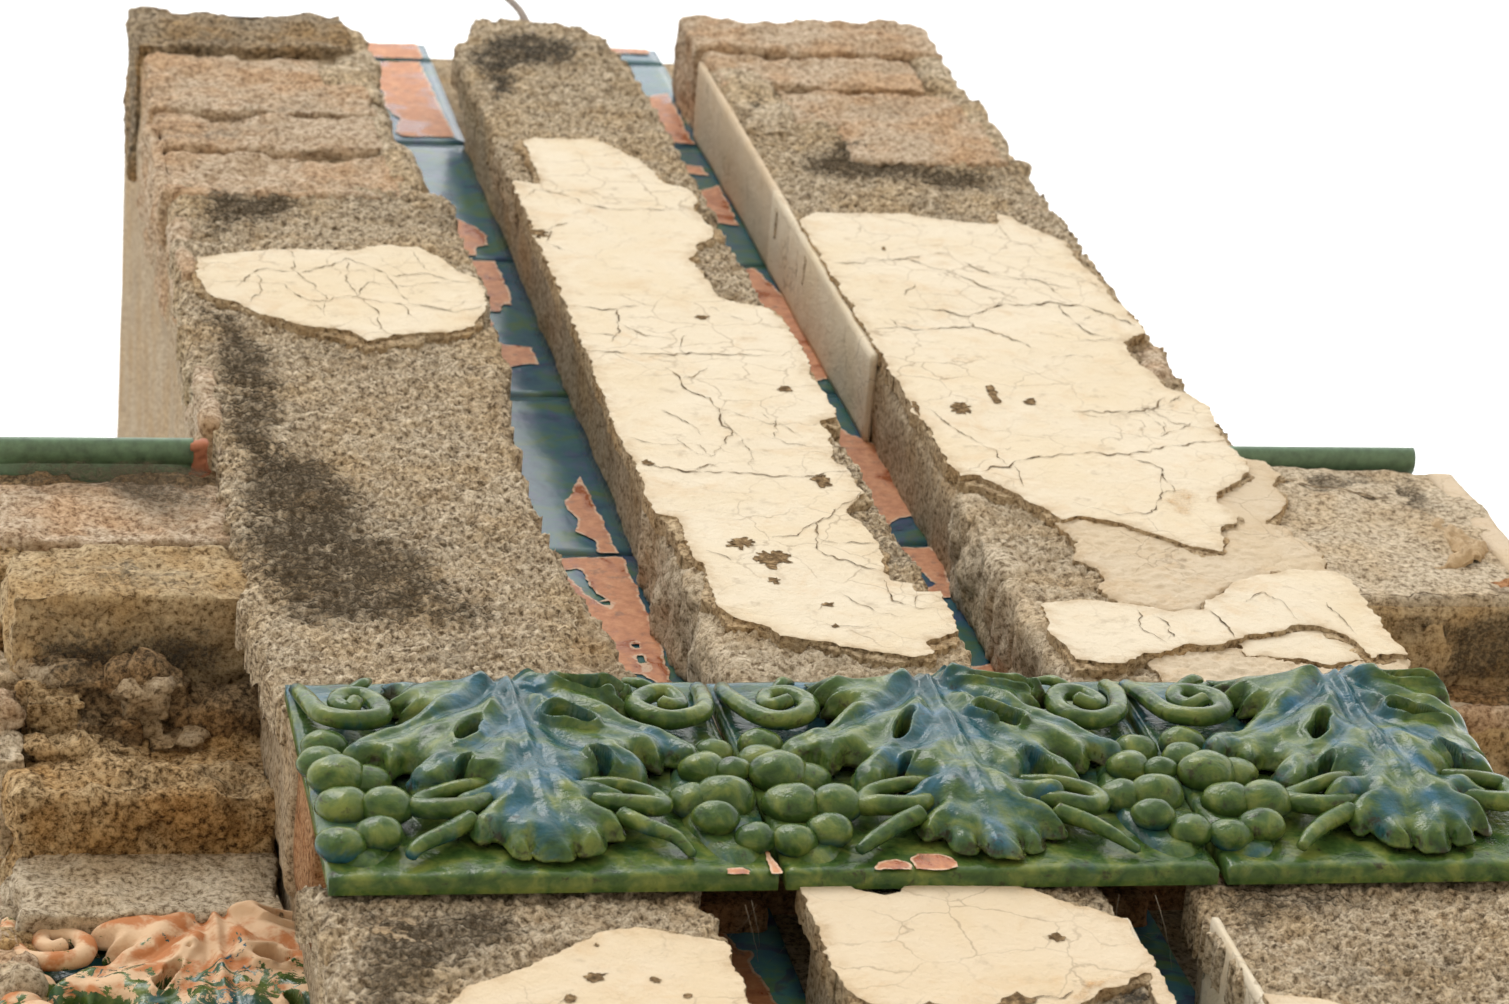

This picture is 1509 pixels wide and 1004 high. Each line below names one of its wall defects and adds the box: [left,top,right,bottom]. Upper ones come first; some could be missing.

spalling [380,18,764,307]
spalling [705,71,1135,318]
crack [216,249,481,328]
crack [838,223,1133,358]
damp [19,461,209,508]
damp [202,310,494,625]
spalling [141,124,637,746]
crack [580,305,927,627]
spalling [809,437,929,592]
crack [925,395,1221,515]
crack [1138,612,1175,641]
spalling [1023,886,1114,916]